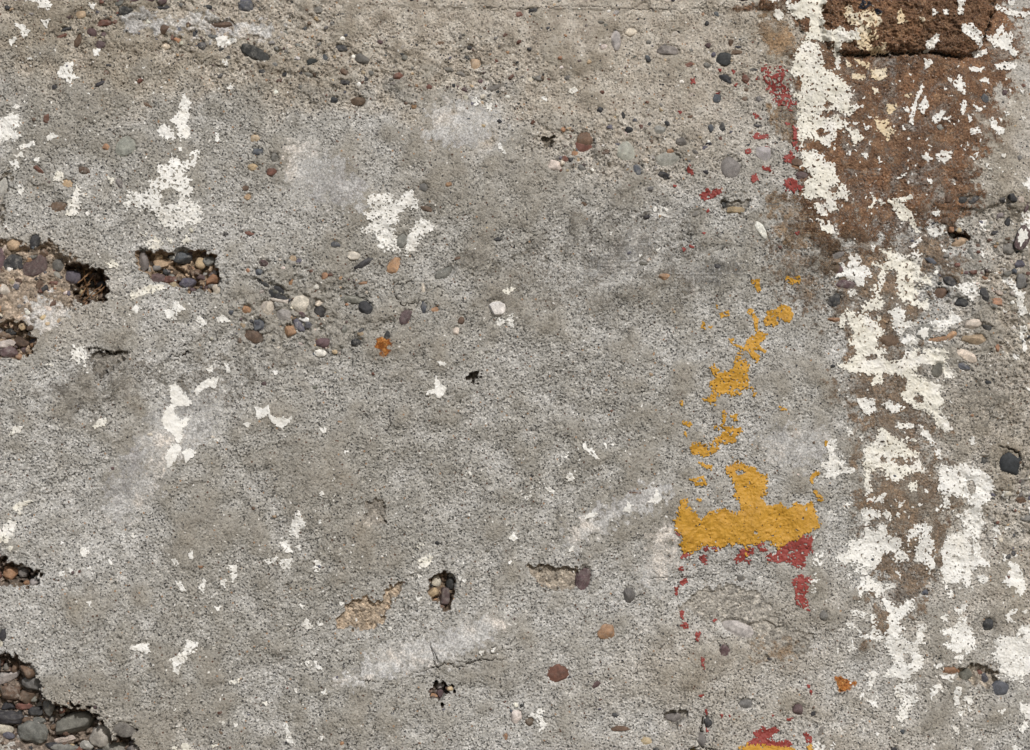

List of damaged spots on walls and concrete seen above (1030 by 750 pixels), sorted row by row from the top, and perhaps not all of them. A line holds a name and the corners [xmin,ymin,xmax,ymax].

spalling [0,86,120,360]
peeling [101,87,220,325]
peeling [196,306,231,328]
peeling [660,0,1030,739]
spalling [0,500,43,589]
peeling [175,578,234,613]
peeling [218,534,238,588]
peeling [258,502,321,569]
spalling [286,543,466,632]
peeling [129,642,151,659]
spalling [0,652,138,750]
peeling [997,700,1030,750]